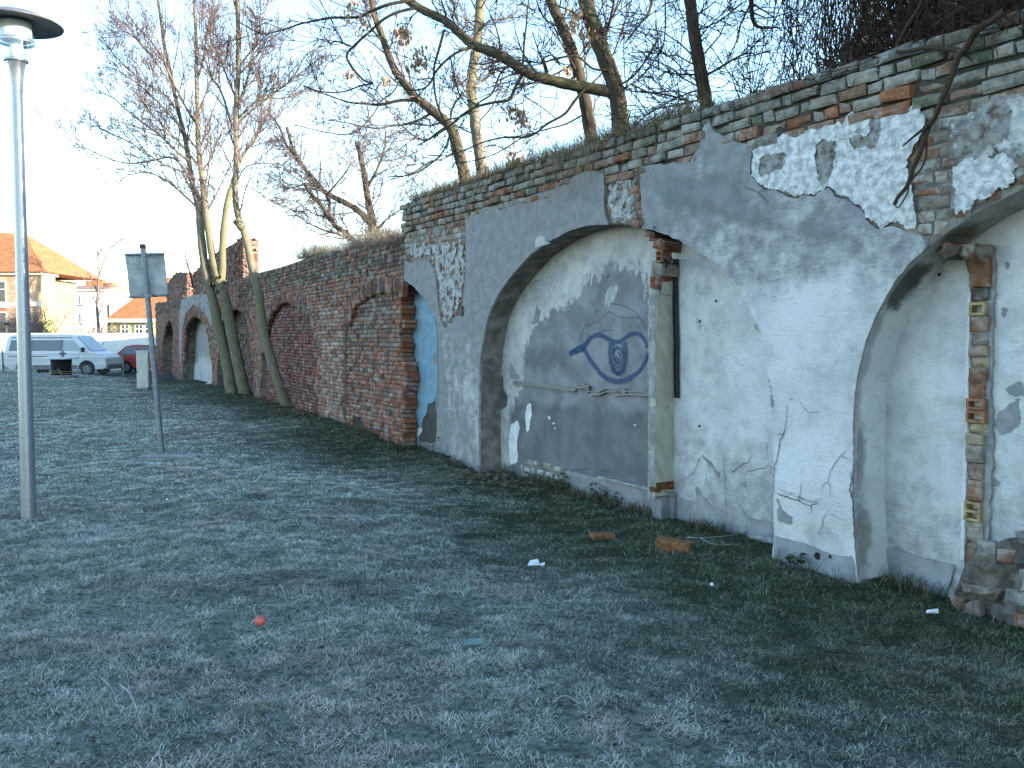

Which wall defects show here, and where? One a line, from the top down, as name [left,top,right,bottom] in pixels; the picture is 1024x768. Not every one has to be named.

spalling [406,241,465,320]
peeling [535,235,550,248]
spalling [604,166,655,229]
spalling [751,106,925,230]
spalling [948,94,1024,214]
peeling [501,259,649,486]
peeling [995,381,1024,435]
crack [685,400,855,549]